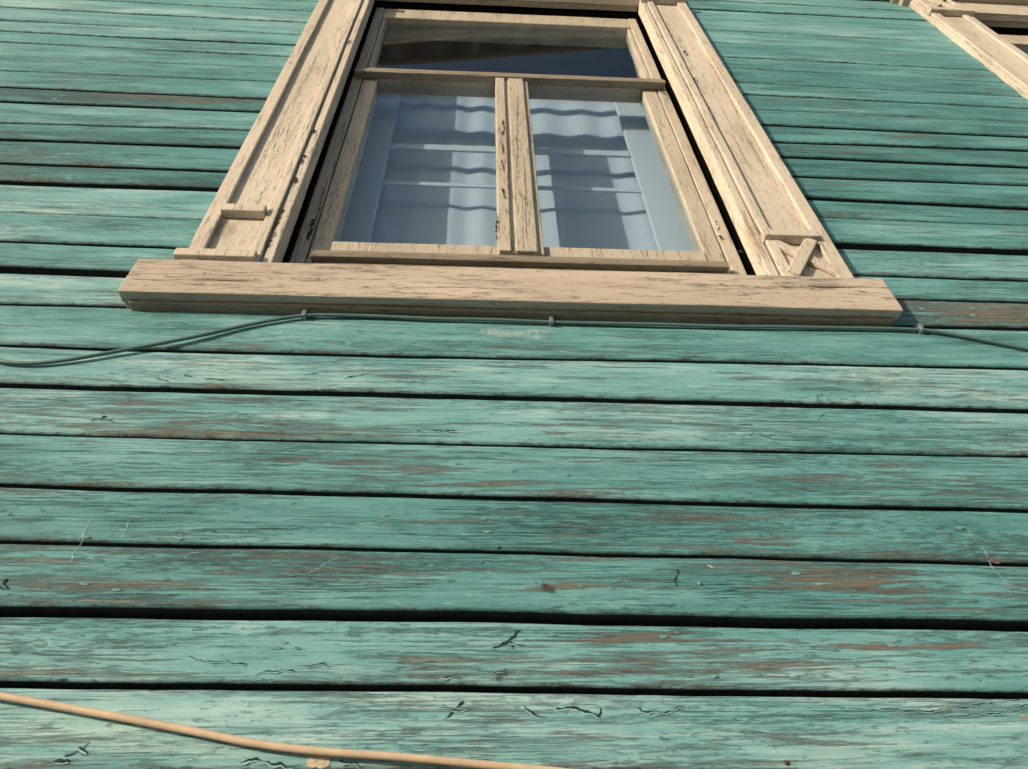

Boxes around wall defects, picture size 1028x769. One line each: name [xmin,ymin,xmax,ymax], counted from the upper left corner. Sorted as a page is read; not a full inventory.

peeling [522,578,622,592]
peeling [735,568,924,594]
peeling [547,630,733,643]
peeling [820,638,987,651]
crack [433,630,524,719]
crack [523,705,601,719]
crack [631,704,683,715]
crack [841,698,1028,719]
crack [47,743,89,766]